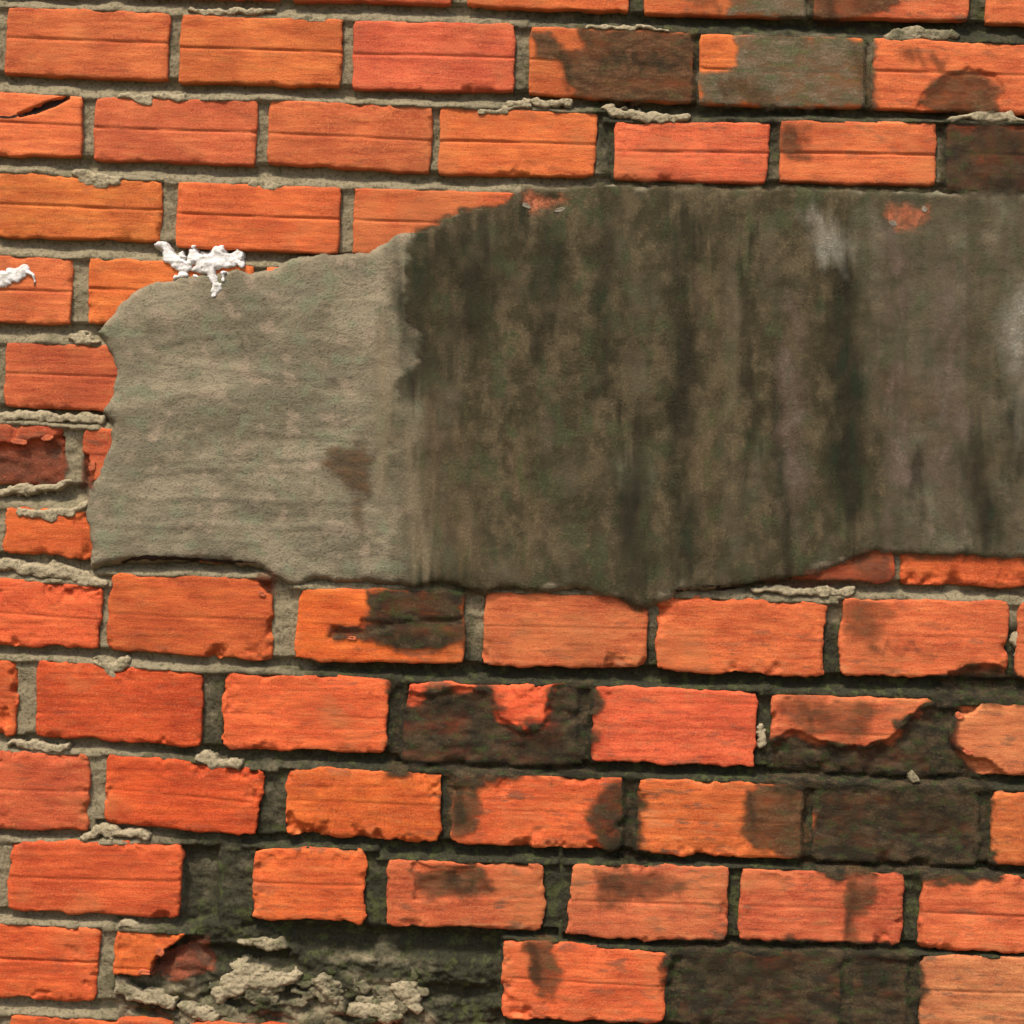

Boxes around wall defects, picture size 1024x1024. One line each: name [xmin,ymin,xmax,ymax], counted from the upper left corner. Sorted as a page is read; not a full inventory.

damp [531,27,695,107]
crack [0,97,68,118]
damp [323,70,1024,611]
damp [741,782,811,859]
spalling [138,937,216,981]